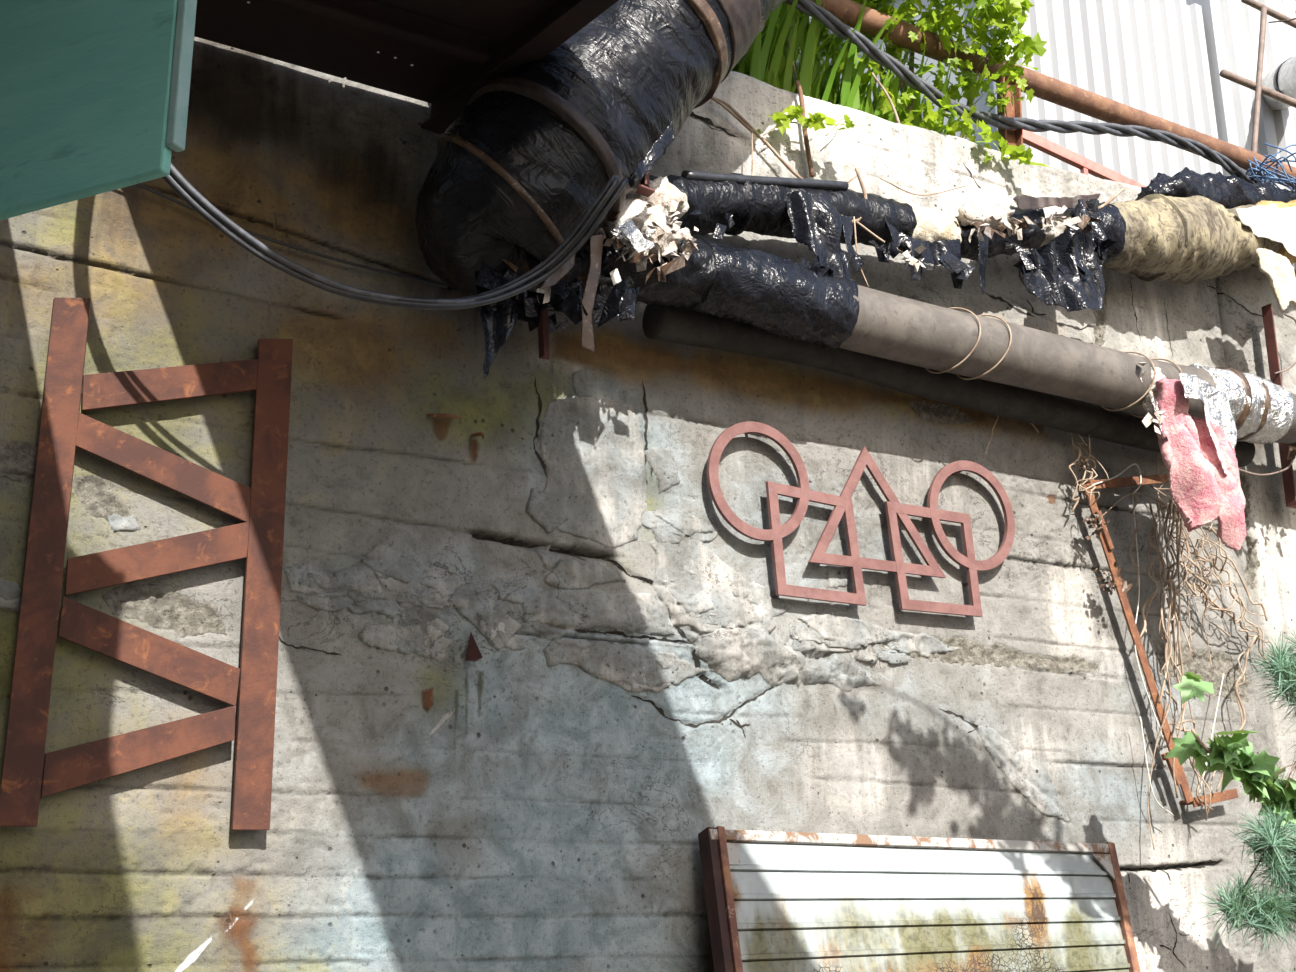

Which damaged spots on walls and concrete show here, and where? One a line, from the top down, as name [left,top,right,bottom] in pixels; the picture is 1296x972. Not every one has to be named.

crack [533,378,548,478]
crack [642,381,653,484]
peeling [284,369,1100,693]
peeling [0,577,21,611]
crack [939,708,979,733]
water stain [175,938,212,972]
rust [225,909,253,969]